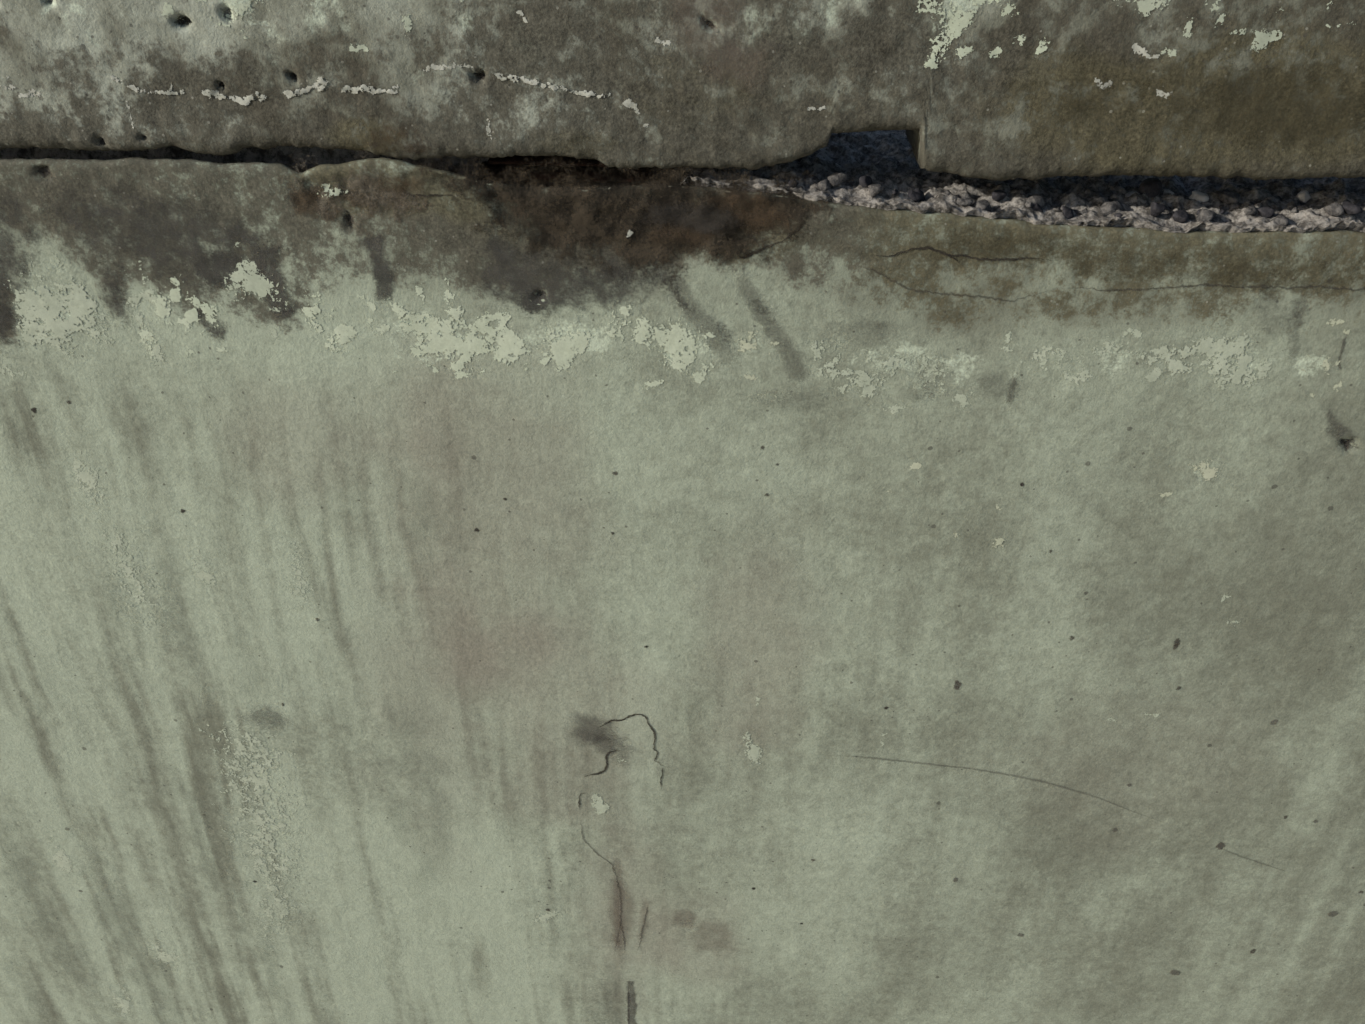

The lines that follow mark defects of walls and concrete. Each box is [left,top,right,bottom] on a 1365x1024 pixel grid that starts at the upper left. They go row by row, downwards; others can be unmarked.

damp [0,202,36,337]
damp [56,198,295,318]
damp [364,236,393,299]
damp [483,239,688,313]
damp [196,309,225,338]
crack [578,714,663,808]
damp [628,982,636,1023]